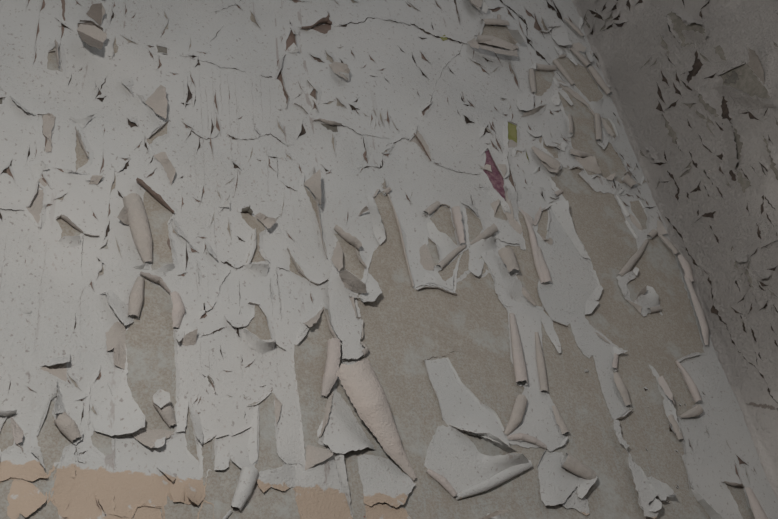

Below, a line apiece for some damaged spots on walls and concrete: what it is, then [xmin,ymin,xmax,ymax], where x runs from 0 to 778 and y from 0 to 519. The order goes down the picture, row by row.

peeling [0,95,94,230]
peeling [52,156,131,249]
peeling [25,0,170,87]
crack [92,72,109,102]
crack [179,0,273,78]
crack [187,126,298,191]
peeling [217,147,284,277]
crack [357,131,412,172]
crack [334,14,468,80]
crack [500,0,553,65]
peeling [639,0,778,244]
peeling [0,384,88,519]